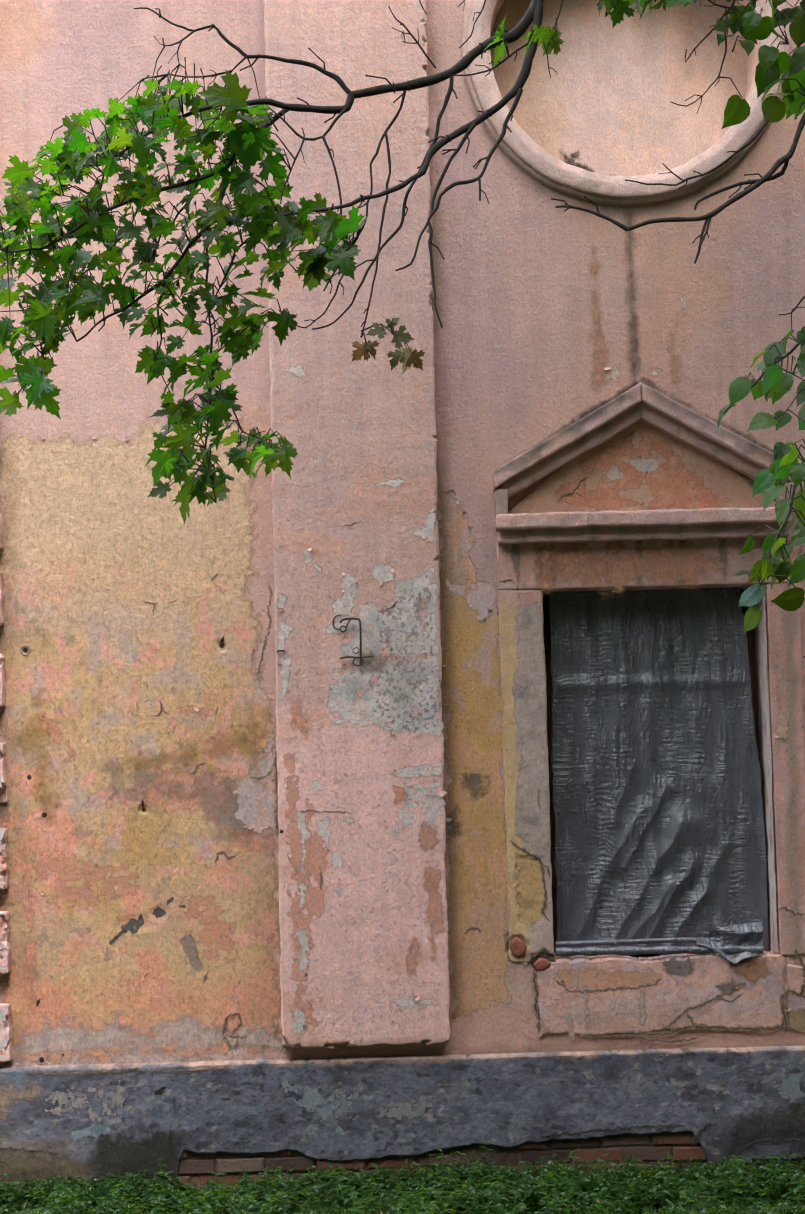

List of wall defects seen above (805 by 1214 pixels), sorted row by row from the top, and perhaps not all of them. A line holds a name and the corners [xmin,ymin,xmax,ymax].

peeling [554,427,735,512]
peeling [0,411,355,1064]
peeling [324,490,662,1019]
damp [0,1014,287,1067]
crack [532,969,662,1036]
crack [580,950,805,1043]
damp [0,1080,136,1125]